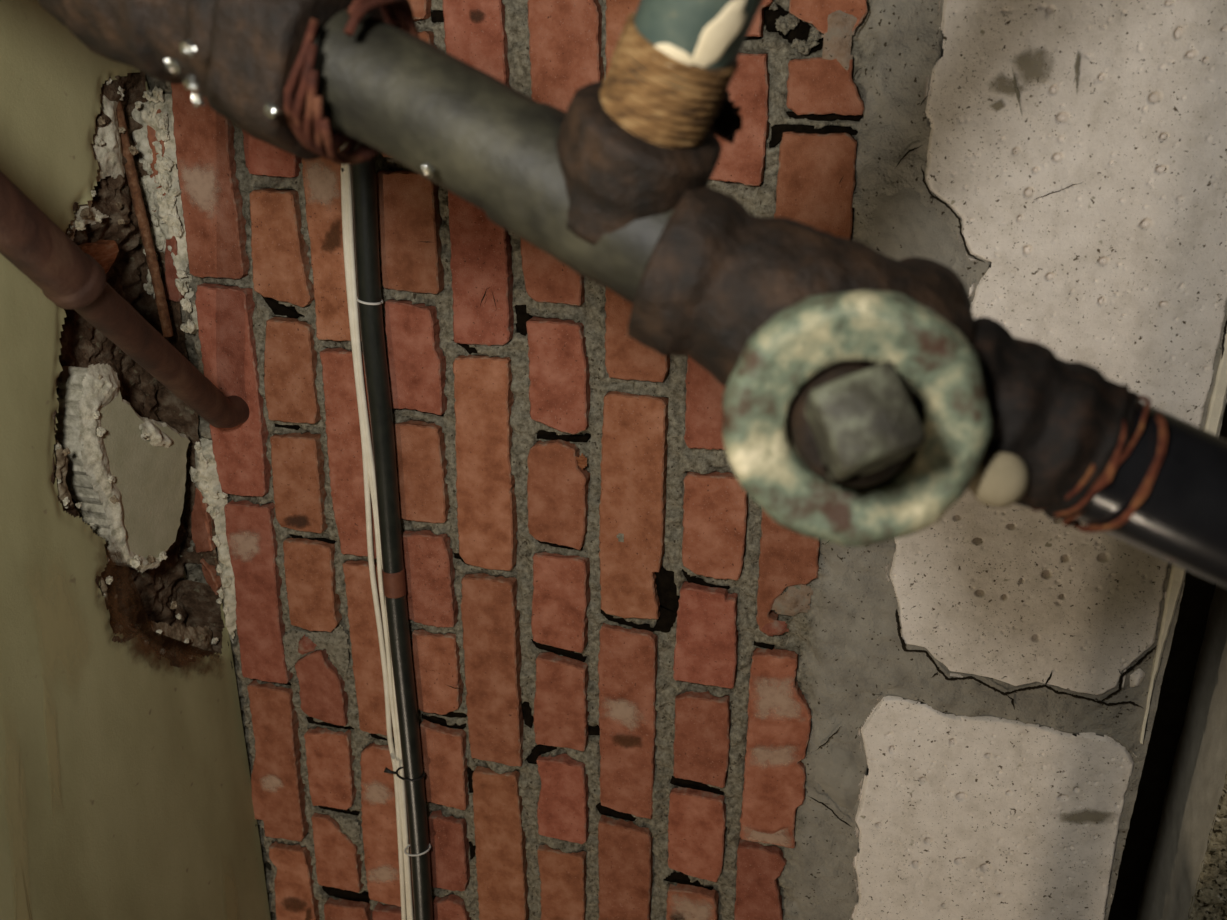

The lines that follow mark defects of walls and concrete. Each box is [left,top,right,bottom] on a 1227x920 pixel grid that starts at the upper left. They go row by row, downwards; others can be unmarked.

peeling [655,0,746,68]
spalling [764,1,824,54]
damp [991,51,1045,111]
spalling [65,72,198,360]
spalling [51,309,236,668]
spalling [654,565,680,633]
spalling [762,584,813,636]
spalling [283,625,350,675]
crack [895,609,1158,709]